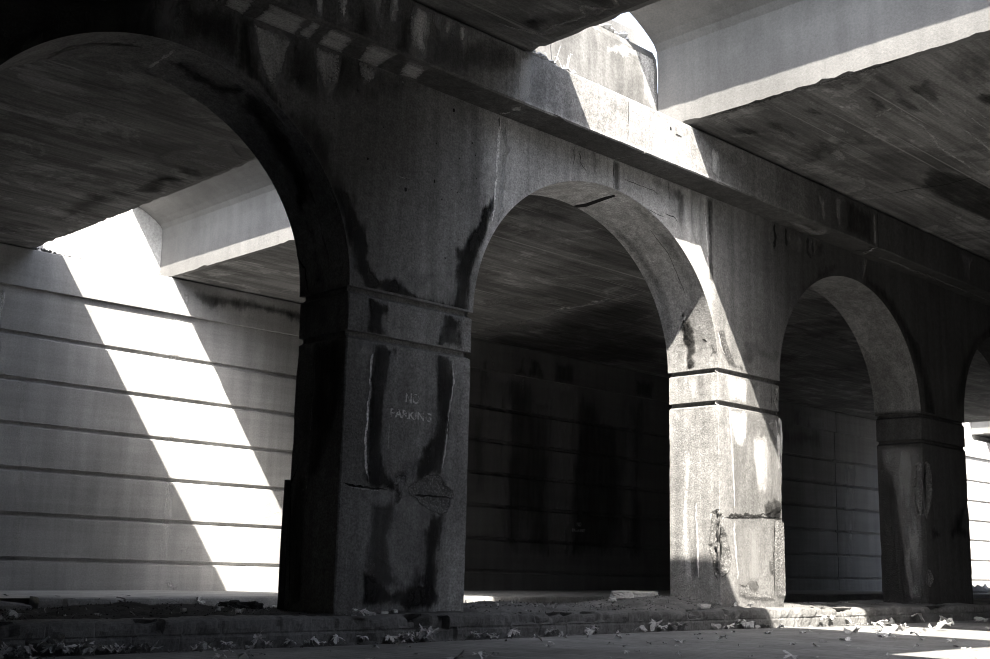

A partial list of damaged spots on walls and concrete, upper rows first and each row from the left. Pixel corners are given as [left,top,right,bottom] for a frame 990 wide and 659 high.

damp [926,171,990,220]
spalling [336,189,494,344]
damp [682,314,695,368]
crack [343,482,401,502]
spalling [363,346,454,609]
damp [368,504,395,587]
spalling [709,510,732,578]
spalling [739,520,786,601]